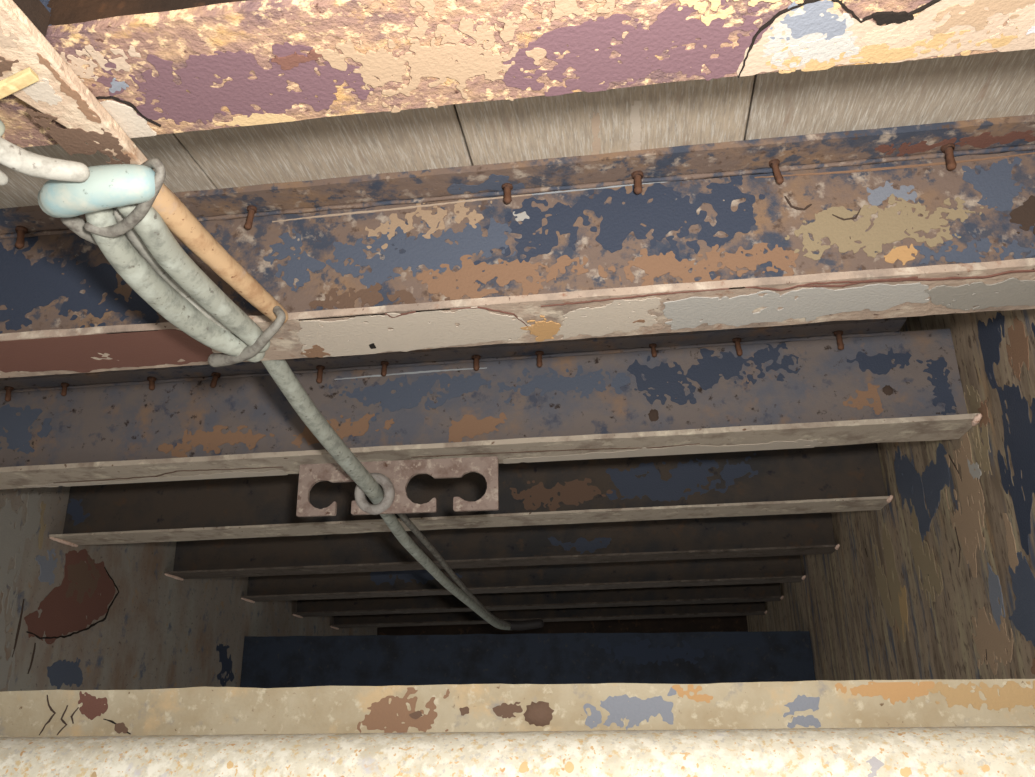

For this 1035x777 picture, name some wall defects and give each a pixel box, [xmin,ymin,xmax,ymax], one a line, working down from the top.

peeling [737,7,808,77]
crack [737,0,941,78]
peeling [820,0,1035,66]
corrosion [365,199,492,249]
peeling [272,181,671,222]
corrosion [416,194,984,302]
corrosion [301,345,331,358]
corrosion [309,283,416,310]
peeling [297,307,533,357]
peeling [556,277,1035,339]
peeling [503,439,823,464]
crack [39,695,79,735]